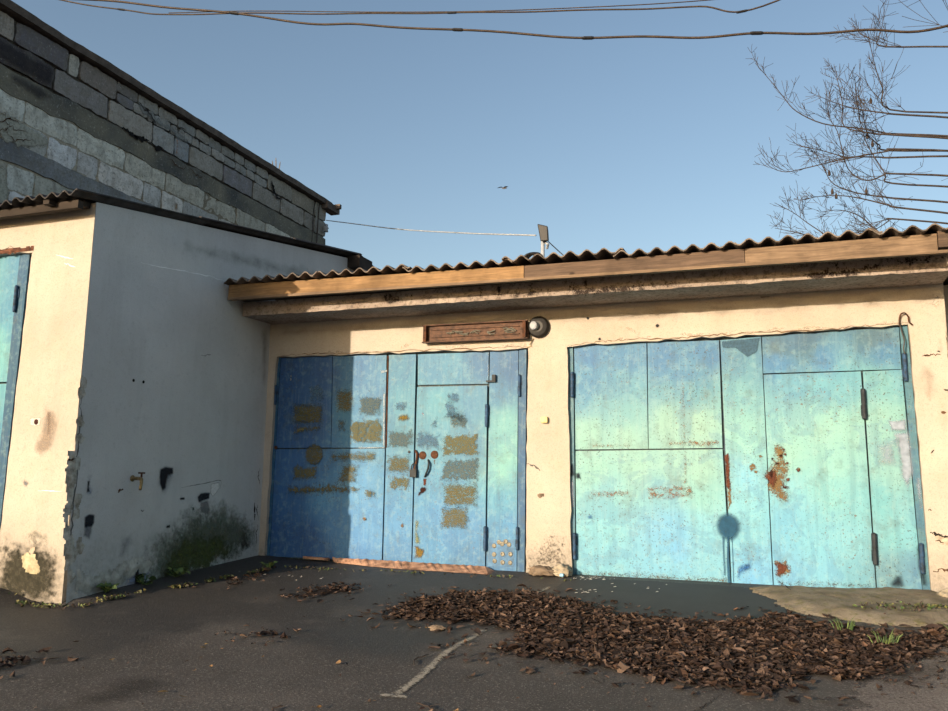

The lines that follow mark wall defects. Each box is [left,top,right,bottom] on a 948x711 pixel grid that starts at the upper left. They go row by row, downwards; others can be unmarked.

flaking render [63,375,87,584]
rust [749,445,800,502]
water stain [129,493,251,584]
water stain [0,546,56,600]
rust [774,560,791,577]